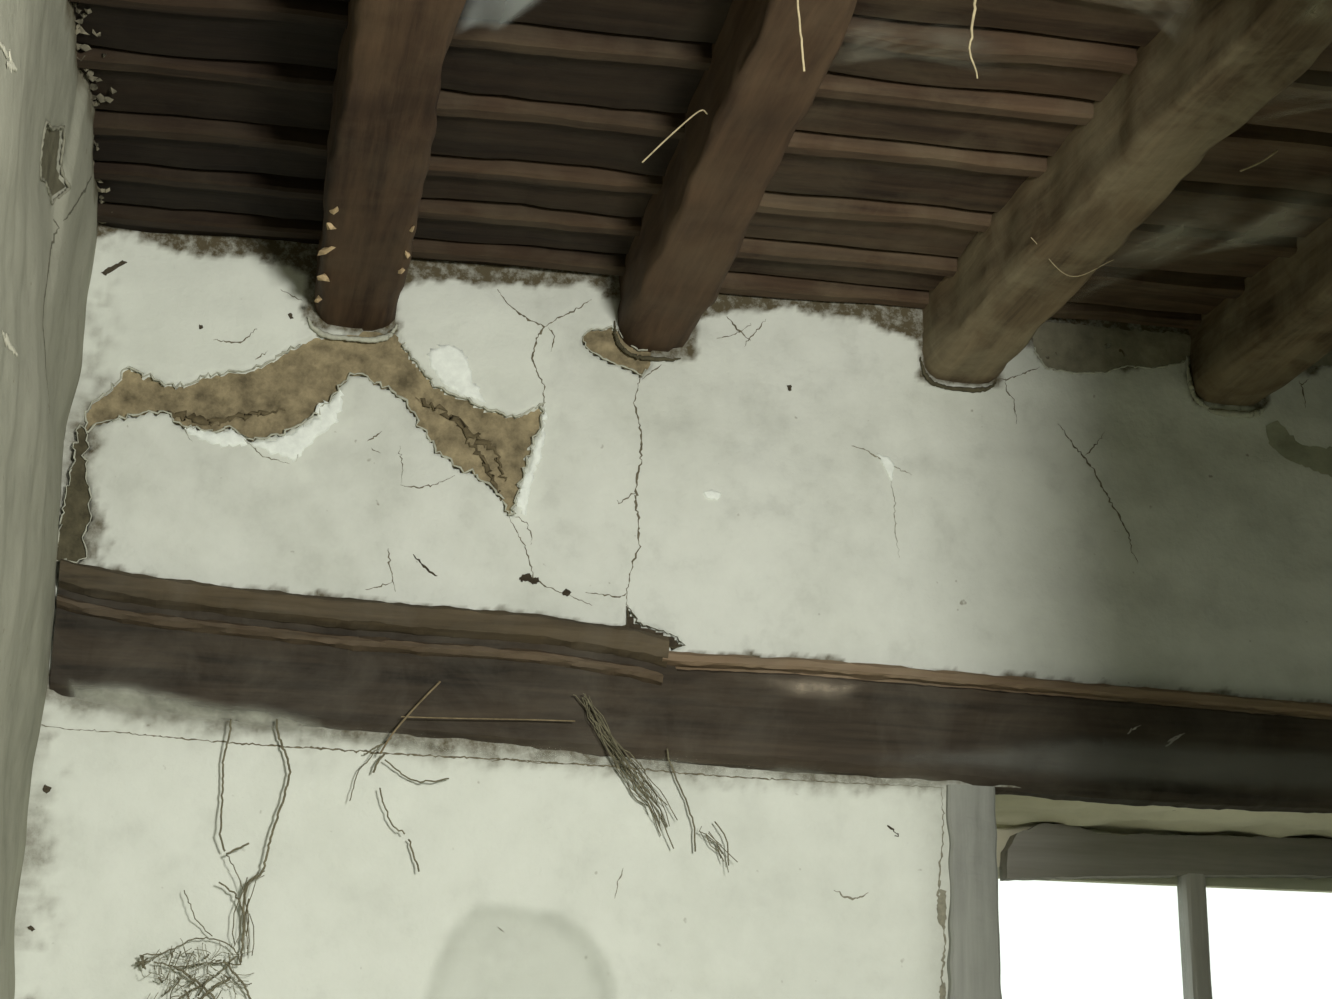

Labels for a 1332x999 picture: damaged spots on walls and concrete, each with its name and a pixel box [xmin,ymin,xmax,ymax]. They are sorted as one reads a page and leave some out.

peeling [40,121,71,206]
crack [497,289,592,405]
spalling [56,331,548,563]
crack [509,365,661,614]
crack [1058,424,1138,562]